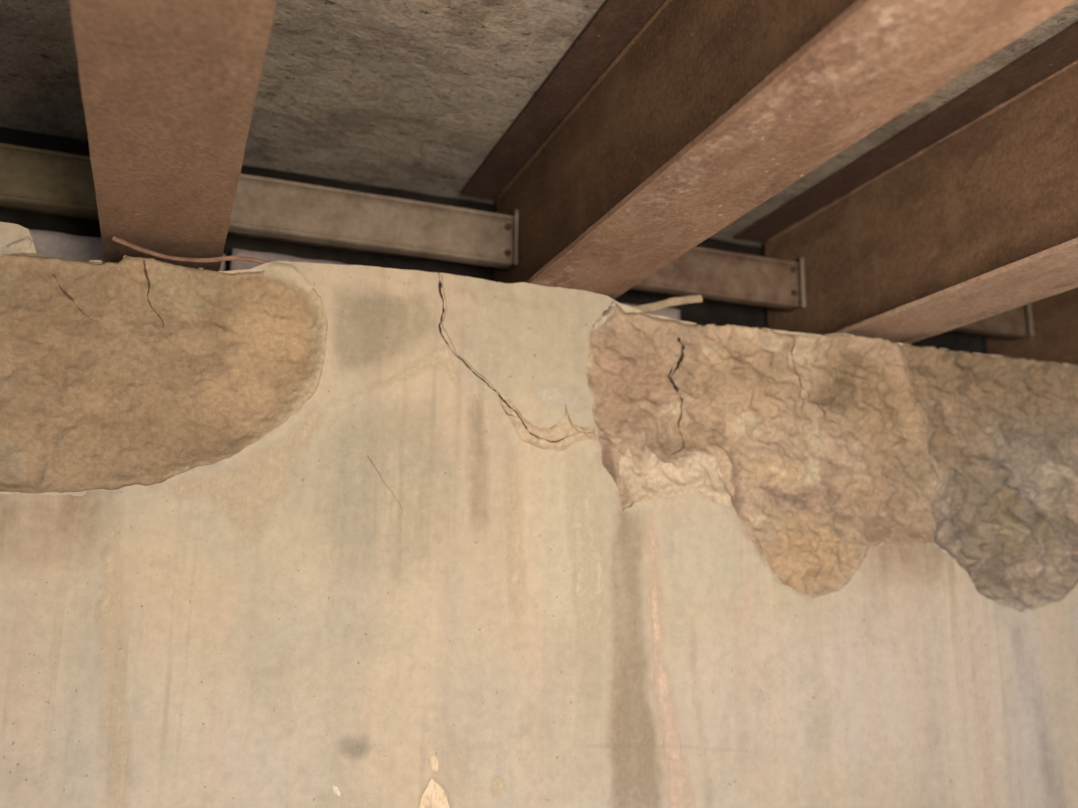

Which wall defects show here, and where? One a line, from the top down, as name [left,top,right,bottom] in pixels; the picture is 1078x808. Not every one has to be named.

spalling [0,236,328,494]
crack [438,272,592,443]
crack [665,337,685,455]
spalling [586,307,1078,612]
peeling [419,755,450,808]